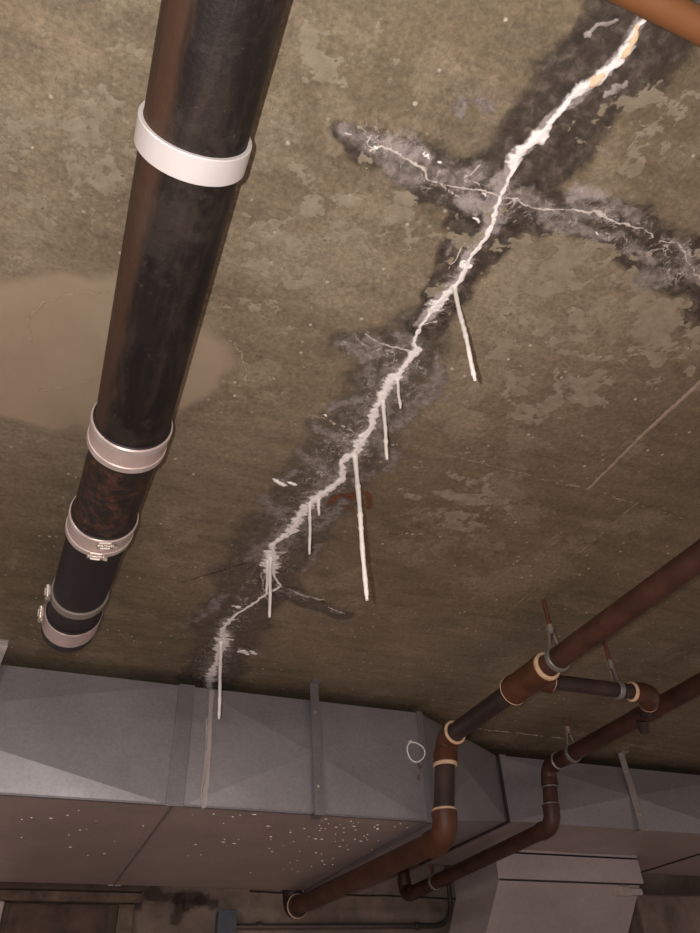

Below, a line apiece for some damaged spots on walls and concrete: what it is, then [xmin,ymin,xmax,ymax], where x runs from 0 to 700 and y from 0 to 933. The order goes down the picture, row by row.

rust [329,492,373,510]
damp [180,0,700,808]
crack [181,19,700,689]